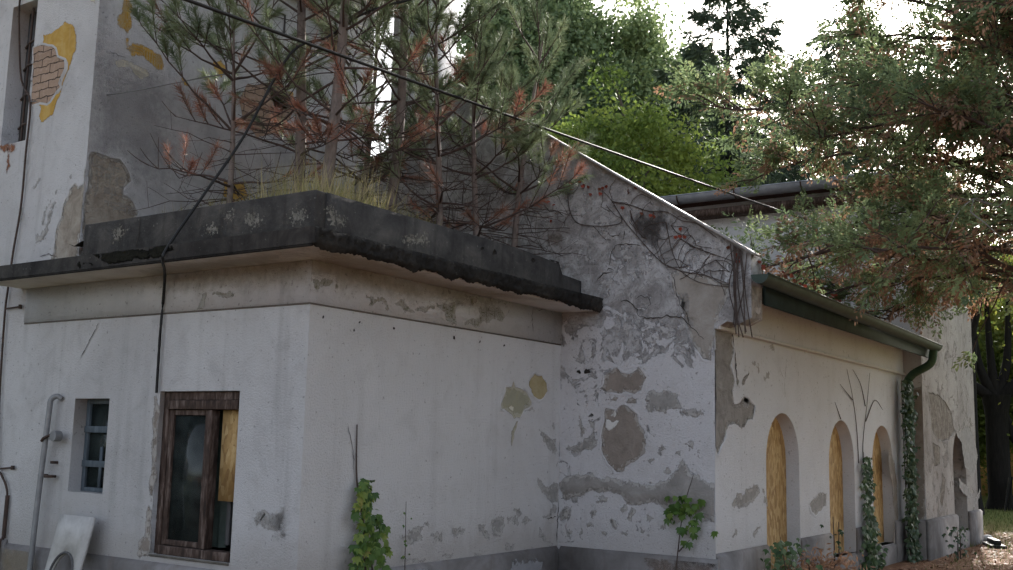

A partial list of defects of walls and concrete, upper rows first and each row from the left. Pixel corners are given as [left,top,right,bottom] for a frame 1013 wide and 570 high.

flaking render [30,22,76,122]
peeling [117,0,164,70]
rust [0,144,15,170]
flaking render [35,150,141,268]
flaking render [366,295,510,327]
flaking render [539,254,770,475]
flaking render [499,371,547,445]
flaking render [255,507,285,538]